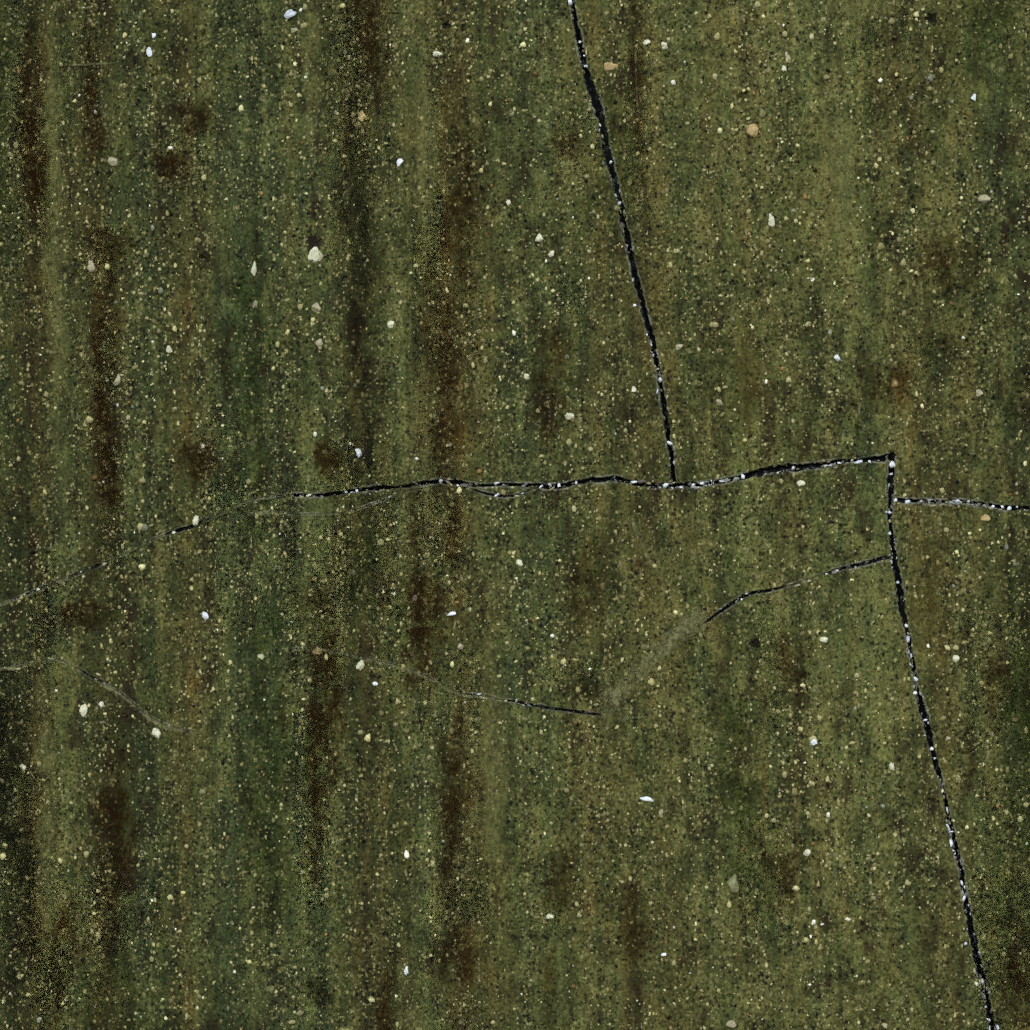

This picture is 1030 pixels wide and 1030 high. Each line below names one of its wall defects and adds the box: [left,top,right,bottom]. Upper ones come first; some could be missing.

crack [0,500,254,606]
crack [209,0,999,1030]
crack [922,497,1030,513]
crack [0,657,200,734]